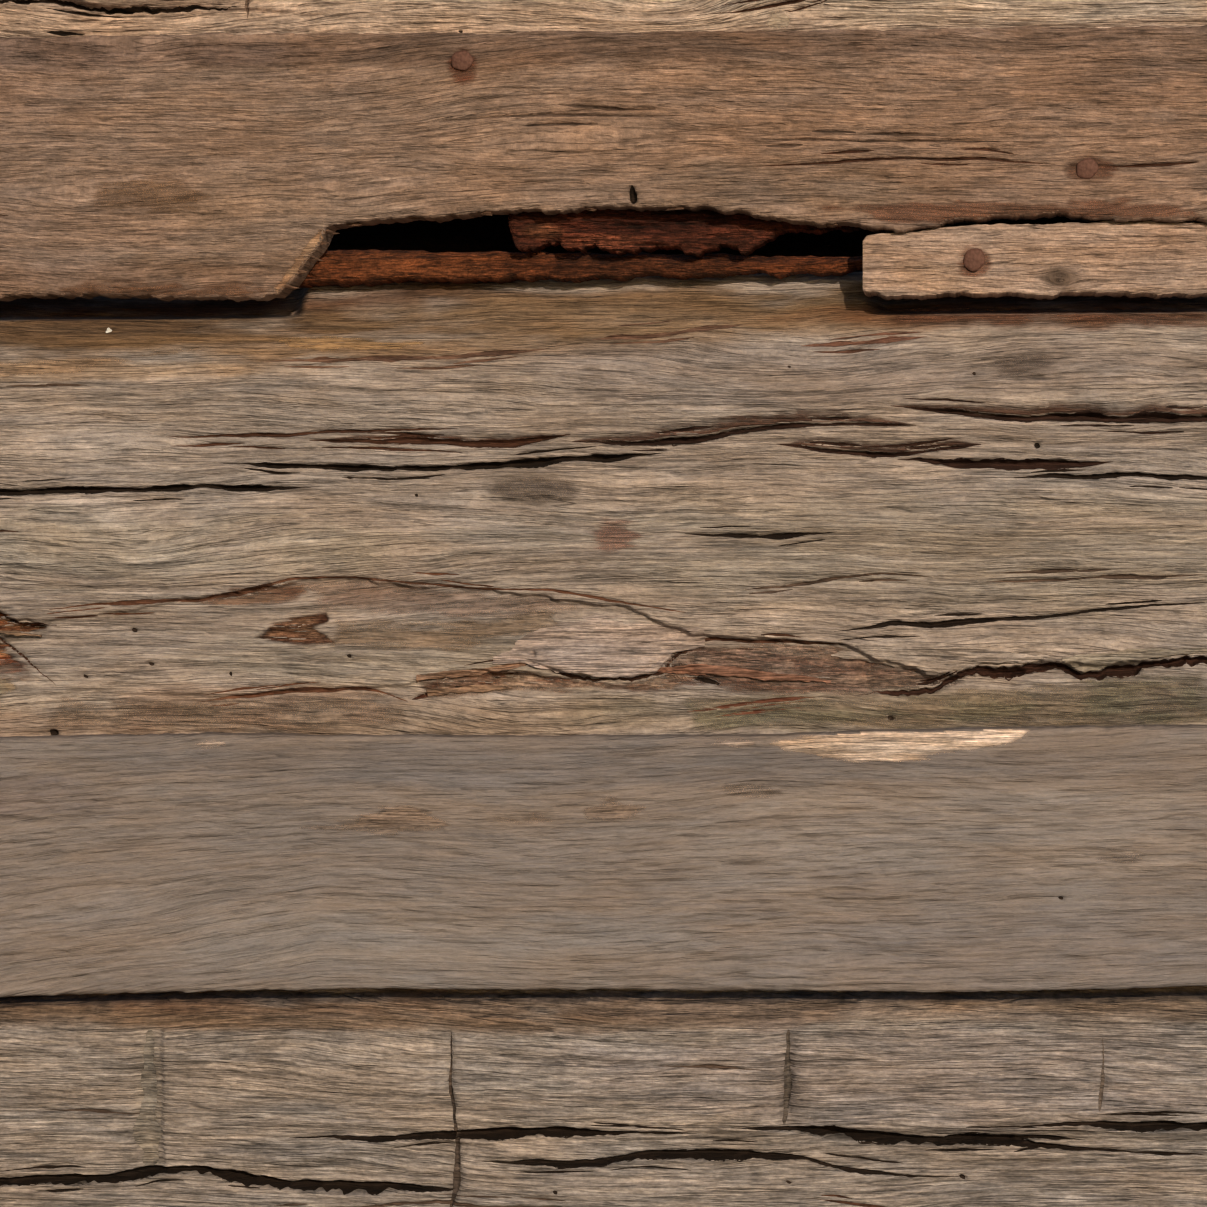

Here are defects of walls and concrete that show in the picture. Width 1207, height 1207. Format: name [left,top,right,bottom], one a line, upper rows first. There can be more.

crack [0,0,236,36]
crack [697,0,827,16]
spalling [275,222,363,292]
crack [0,398,1207,501]
crack [0,572,686,683]
peeling [310,582,549,616]
crack [201,569,1207,717]
spalling [416,615,1207,698]
crack [50,1107,140,1115]
crack [0,1111,1207,1207]